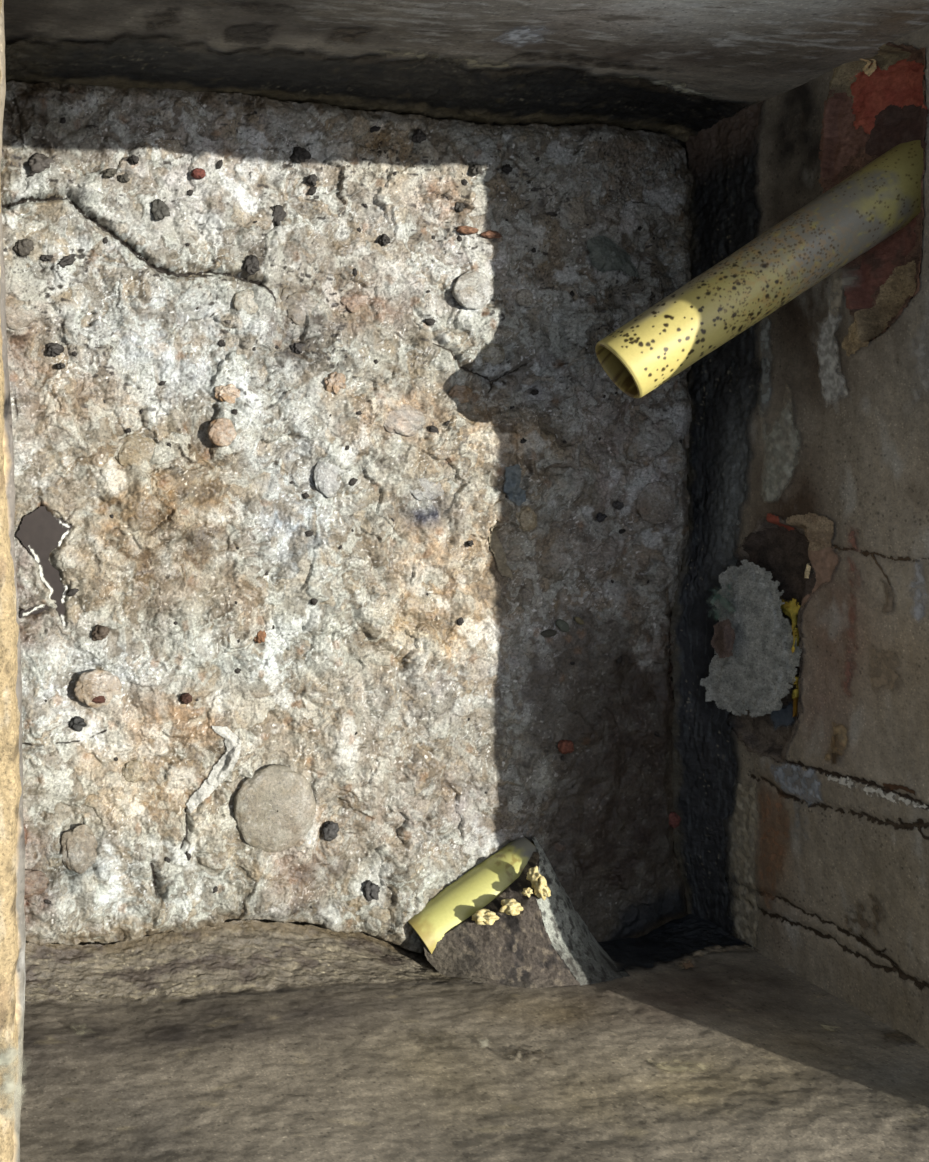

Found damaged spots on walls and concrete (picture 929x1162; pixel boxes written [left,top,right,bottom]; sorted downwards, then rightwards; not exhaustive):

crack [1,194,276,302]
spalling [819,42,929,357]
crack [831,545,929,585]
spalling [729,512,839,765]
crack [748,758,929,840]
crack [725,877,929,991]